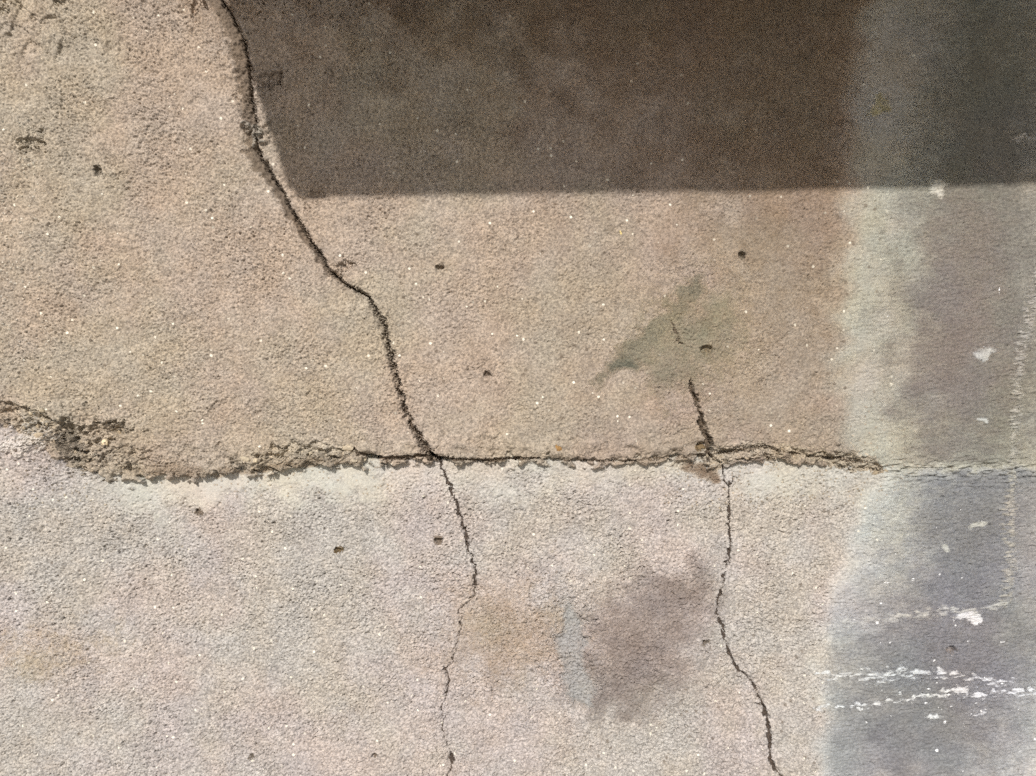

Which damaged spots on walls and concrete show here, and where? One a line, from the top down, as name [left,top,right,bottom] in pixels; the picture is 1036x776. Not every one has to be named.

crack [148,0,868,776]
water stain [451,0,861,202]
water stain [597,274,746,393]
water stain [813,0,1036,776]